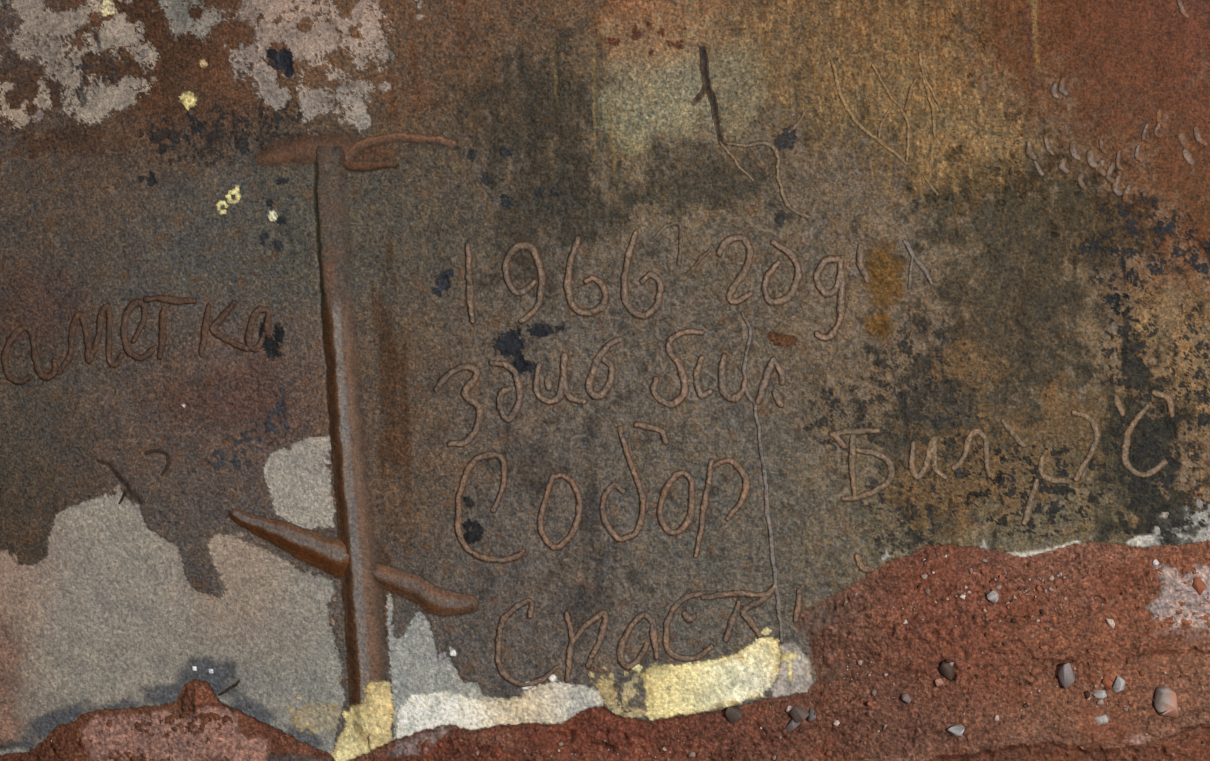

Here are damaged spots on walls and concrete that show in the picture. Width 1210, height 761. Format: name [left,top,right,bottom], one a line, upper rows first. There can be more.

peeling [0,0,160,129]
peeling [152,0,402,136]
crack [691,45,809,219]
rust [989,0,1210,244]
water stain [476,0,1210,560]
peeling [263,435,336,530]
crack [741,312,784,643]
spalling [0,473,1210,761]